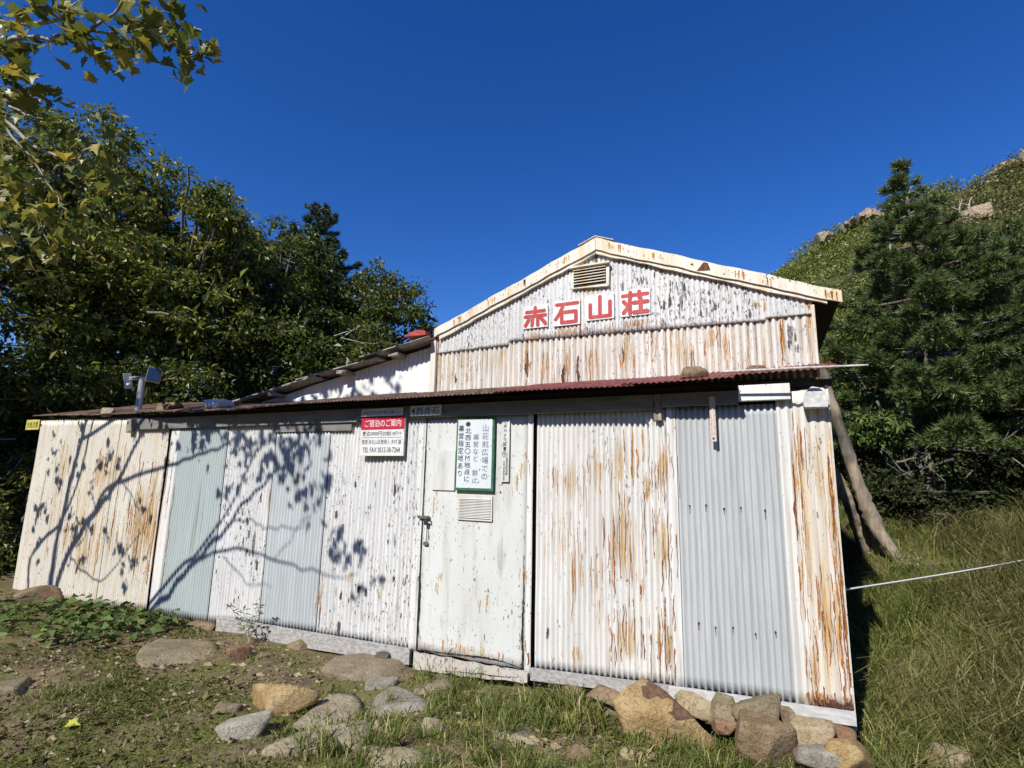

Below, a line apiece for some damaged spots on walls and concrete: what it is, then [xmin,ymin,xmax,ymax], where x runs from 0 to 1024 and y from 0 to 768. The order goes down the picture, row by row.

rust [437,317,752,386]
peeling [621,264,758,328]
rust [37,438,175,600]
rust [544,427,680,685]
rust [791,413,852,707]